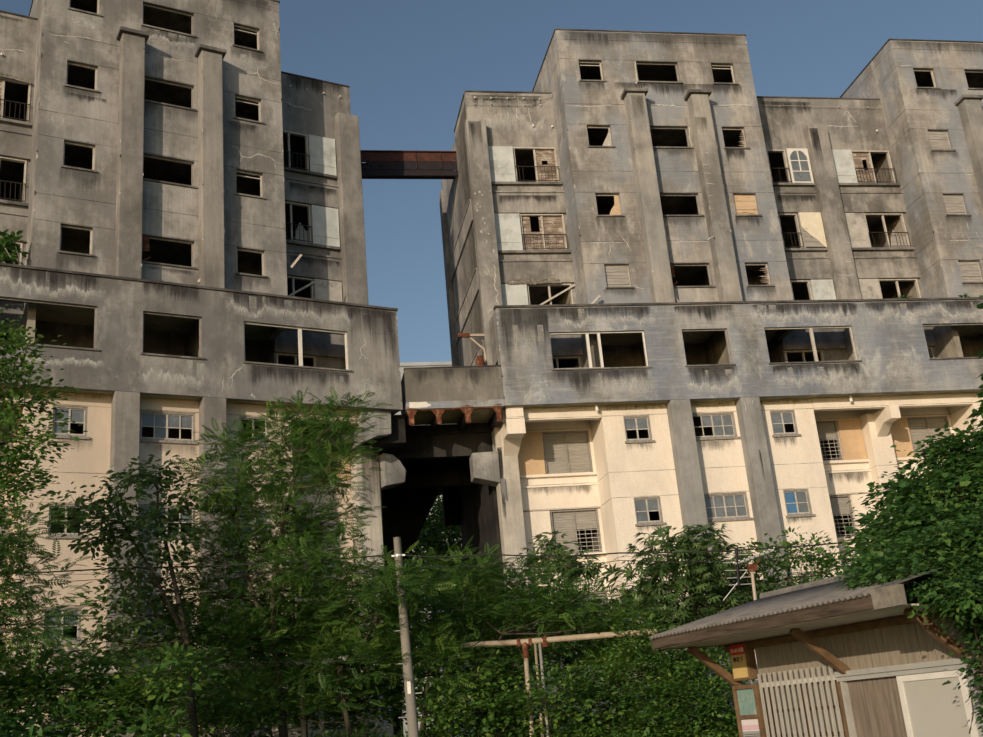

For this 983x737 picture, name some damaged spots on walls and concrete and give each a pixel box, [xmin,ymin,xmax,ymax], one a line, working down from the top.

damp [0,266,96,296]
damp [144,282,198,296]
damp [231,292,395,345]
damp [675,305,730,317]
damp [751,300,982,321]
damp [9,354,100,366]
damp [252,365,348,382]
damp [688,366,739,392]
damp [773,363,859,385]